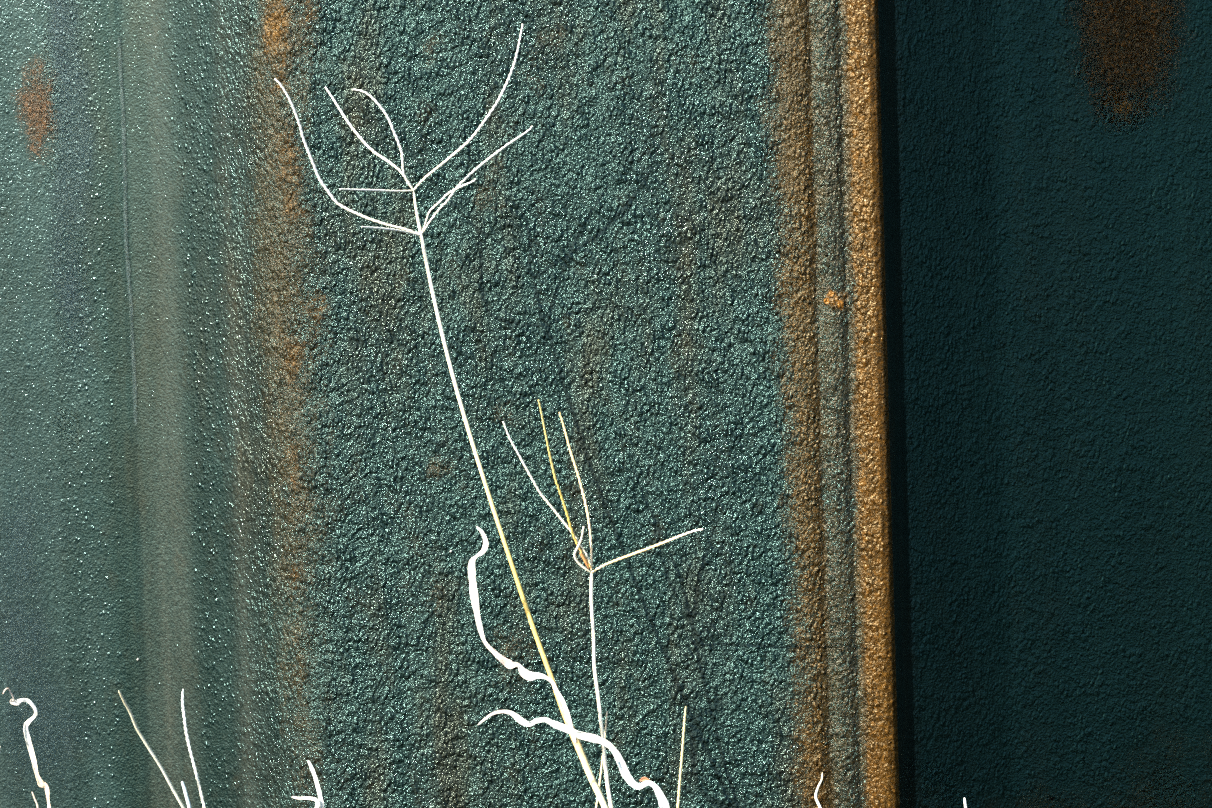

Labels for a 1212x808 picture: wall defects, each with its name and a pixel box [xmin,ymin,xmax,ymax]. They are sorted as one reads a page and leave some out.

corrosion [781,0,900,808]